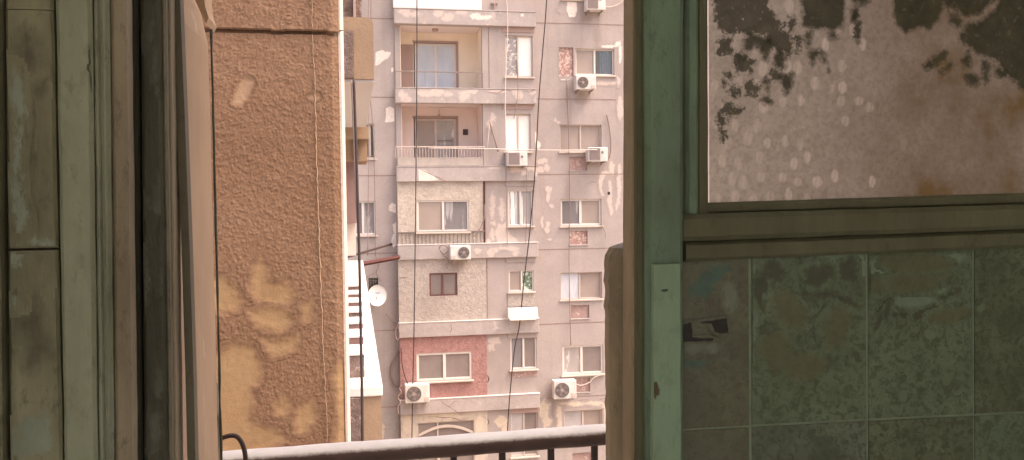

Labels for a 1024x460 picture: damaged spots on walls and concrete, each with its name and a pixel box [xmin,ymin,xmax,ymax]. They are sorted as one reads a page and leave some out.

peeling [566,2,578,18]
peeling [374,49,394,74]
peeling [383,89,536,123]
peeling [486,129,555,242]
peeling [597,160,622,217]
peeling [472,189,521,257]
spalling [683,316,730,346]